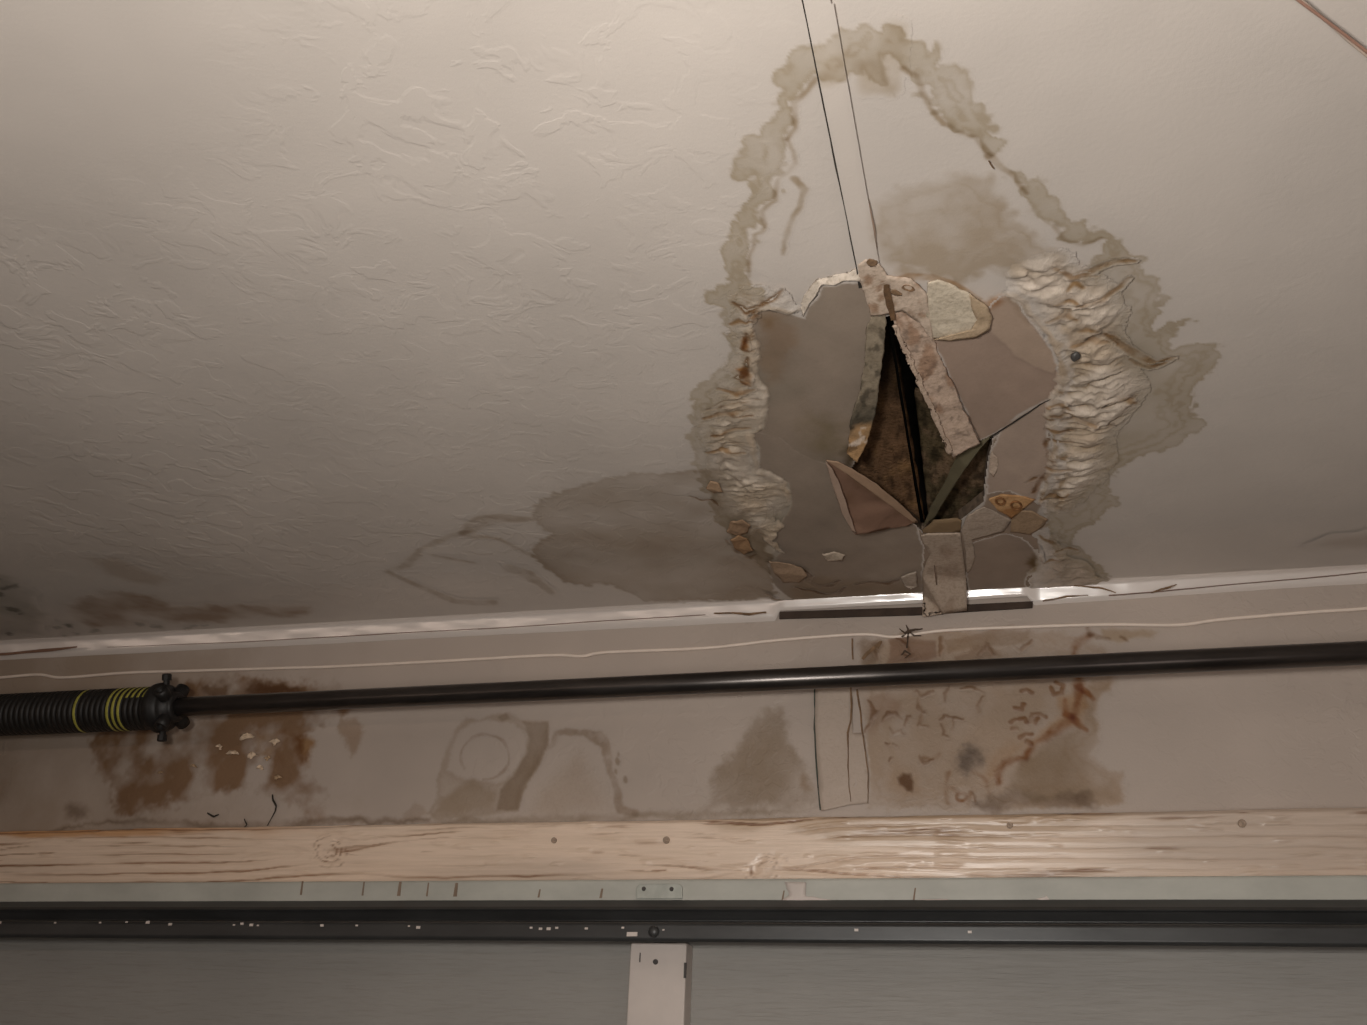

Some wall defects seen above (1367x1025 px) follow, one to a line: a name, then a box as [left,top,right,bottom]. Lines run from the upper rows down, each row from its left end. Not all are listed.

leakage [380,41,819,607]
leakage [838,15,1228,580]
peeling [753,269,930,600]
peeling [926,279,1059,590]
leakage [0,553,317,638]
leakage [177,670,345,697]
leakage [44,703,819,831]
leakage [854,676,1131,815]
leakage [853,623,1160,665]
rust [992,677,1098,787]
rust [1068,627,1130,655]